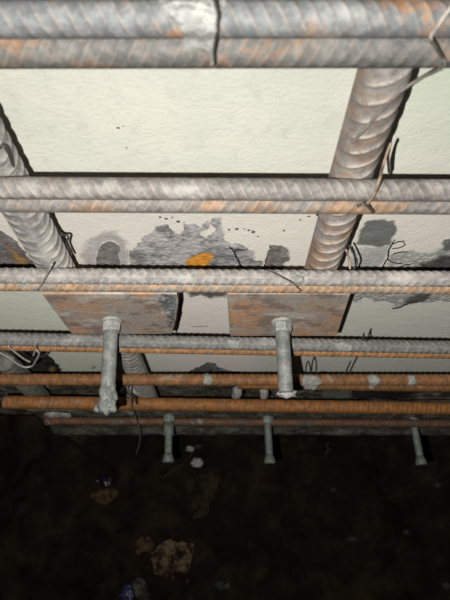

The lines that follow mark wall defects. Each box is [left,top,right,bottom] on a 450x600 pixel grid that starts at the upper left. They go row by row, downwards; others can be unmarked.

crack [212,0,220,65]
spalling [0,0,450,310]
rust [186,253,214,269]
crack [382,240,412,271]